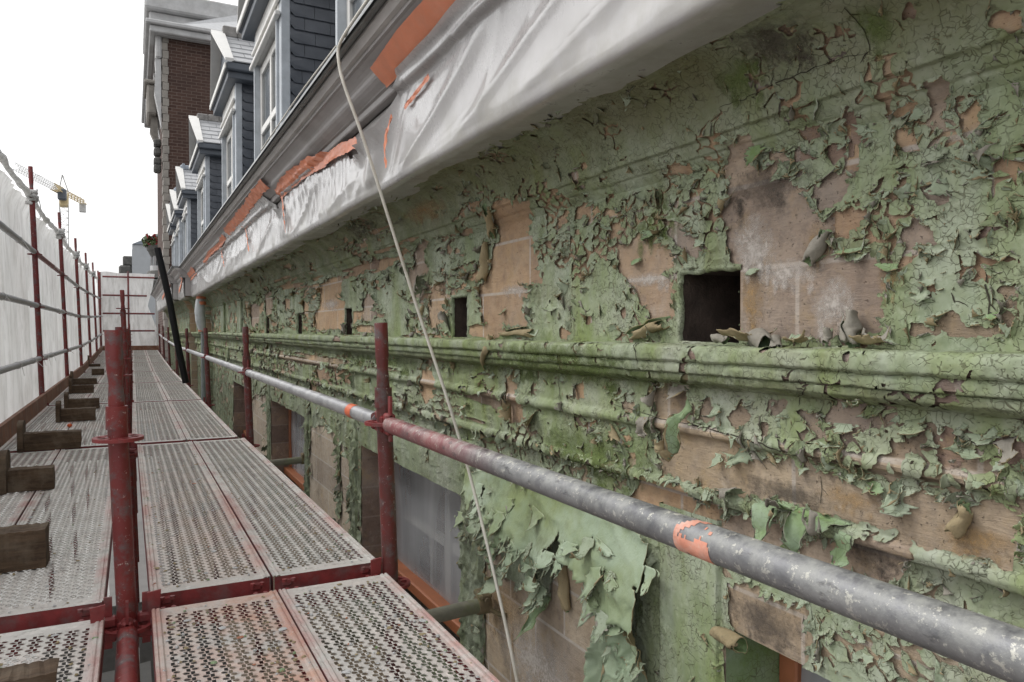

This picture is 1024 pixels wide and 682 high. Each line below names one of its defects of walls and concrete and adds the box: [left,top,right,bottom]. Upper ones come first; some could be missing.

crack [719,8,870,108]
peeling [227,57,1024,596]
crack [951,270,999,322]
peeling [464,545,595,682]